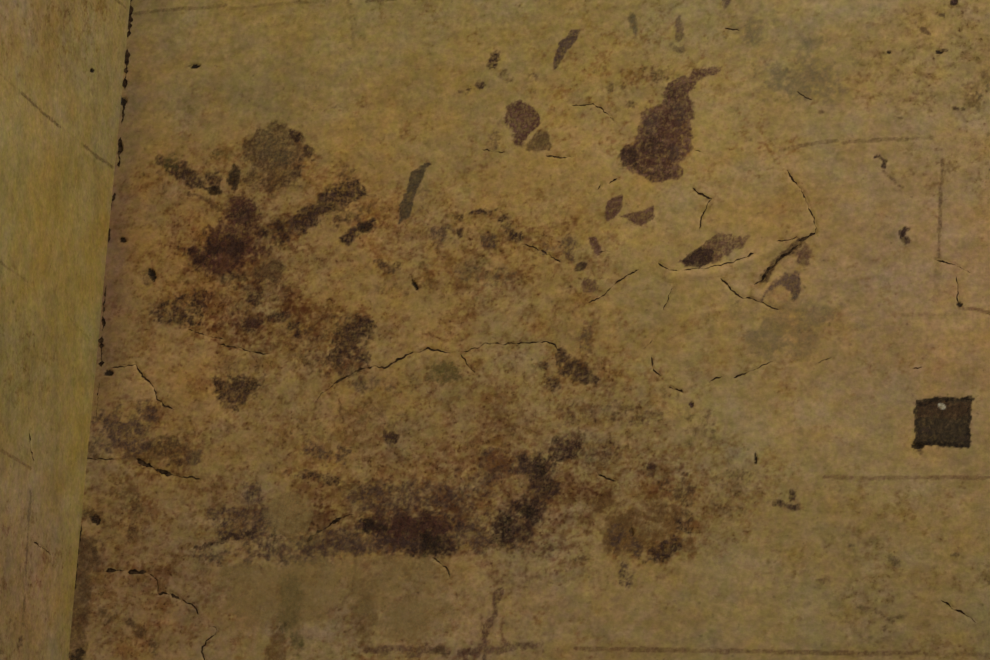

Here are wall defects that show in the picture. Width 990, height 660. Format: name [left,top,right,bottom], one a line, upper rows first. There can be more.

damp [156,123,314,195]
damp [258,173,376,246]
damp [399,163,430,224]
damp [606,196,654,226]
crack [590,171,817,310]
damp [681,234,745,267]
damp [150,292,212,326]
damp [214,377,260,412]
damp [325,315,377,375]
crack [317,341,559,400]
damp [542,348,600,391]
damp [194,438,580,565]